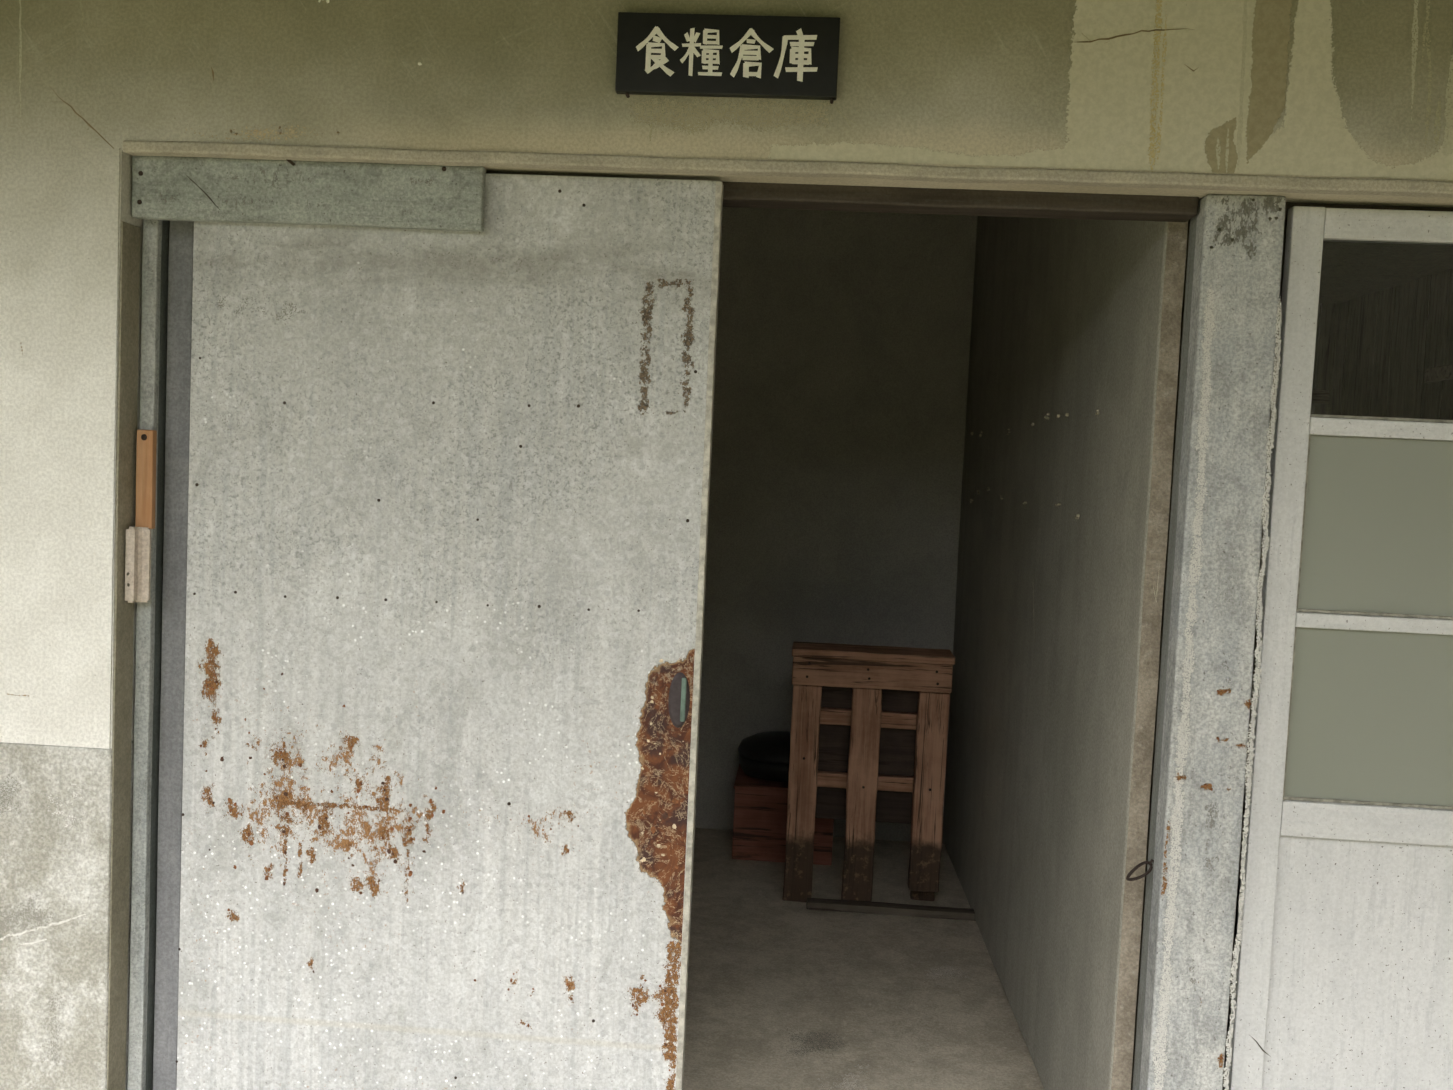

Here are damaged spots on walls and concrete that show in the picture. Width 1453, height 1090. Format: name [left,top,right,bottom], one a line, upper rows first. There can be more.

crack [1080,28,1193,43]
damp [1204,0,1293,173]
efflorescence [1411,0,1453,156]
rust [198,638,445,905]
rust [625,649,695,1090]